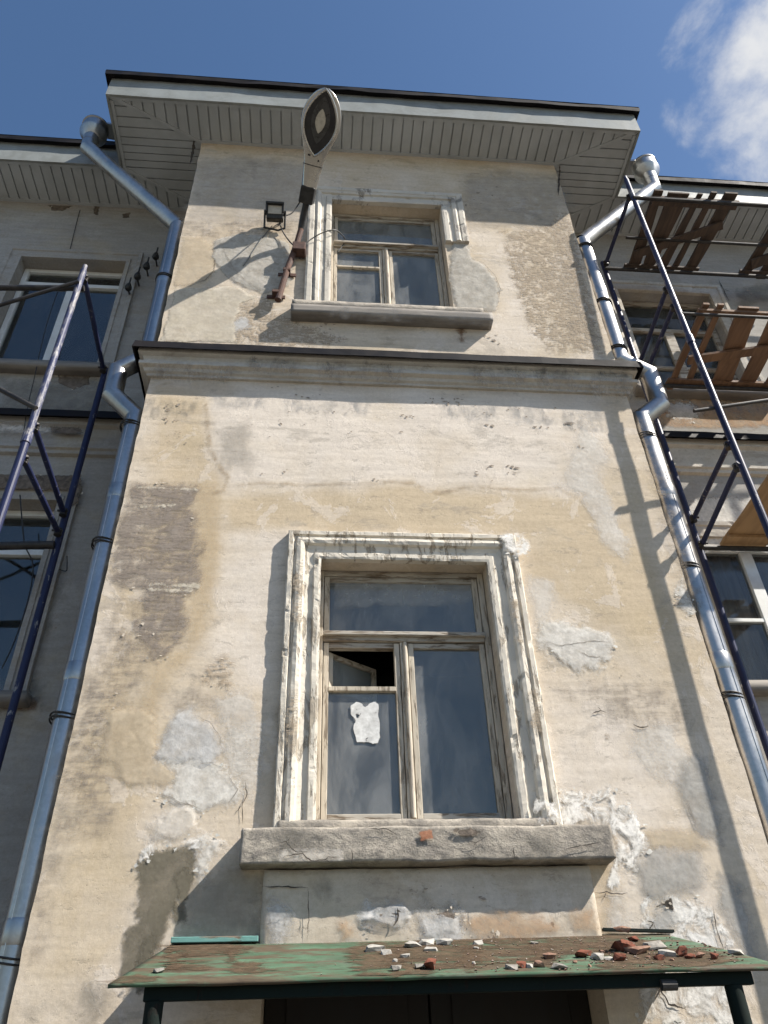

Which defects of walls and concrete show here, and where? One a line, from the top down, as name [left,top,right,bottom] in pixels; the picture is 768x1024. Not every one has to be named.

flaking render [449,243,501,311]
flaking render [513,601,617,672]
flaking render [156,755,241,815]
flaking render [533,800,561,826]
flaking render [134,834,225,880]
water stain [121,847,197,976]